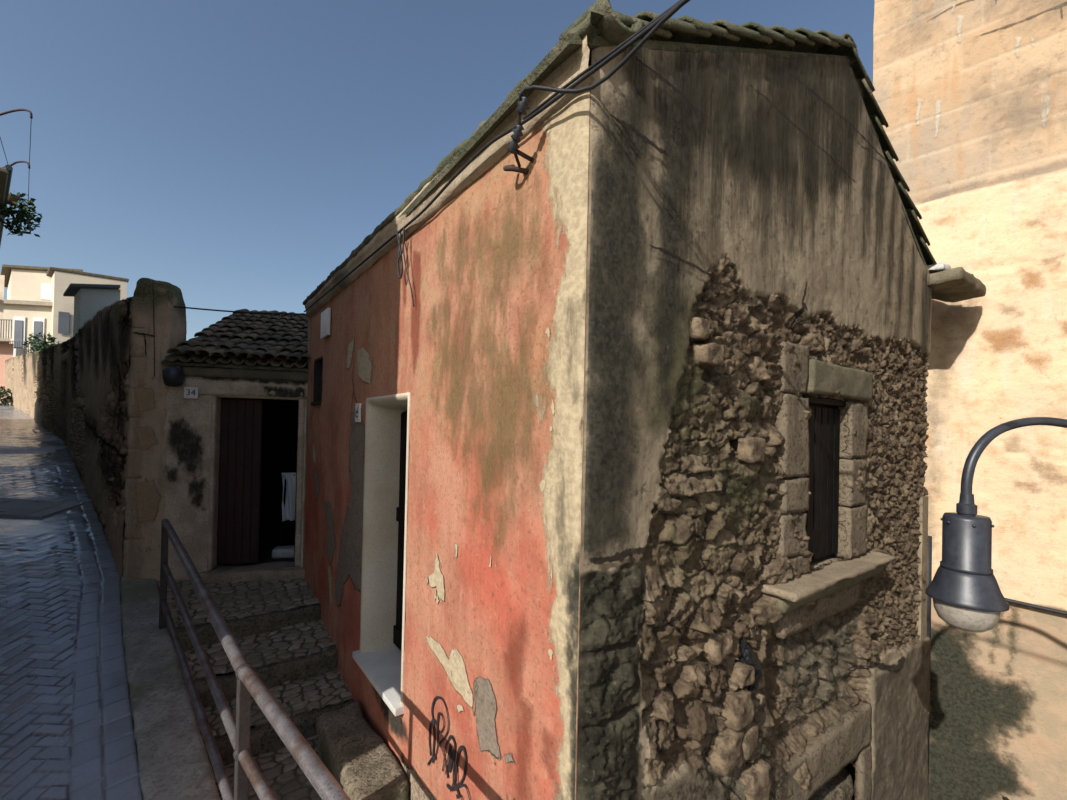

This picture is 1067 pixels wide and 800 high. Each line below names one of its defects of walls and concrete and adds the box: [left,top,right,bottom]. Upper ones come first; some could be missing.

damp [165,419,205,510]
flaking render [313,413,365,606]
peeling [346,338,372,384]
damp [402,253,420,367]
peeling [426,553,445,604]
damp [432,304,532,482]
damp [564,45,934,800]
flaking render [636,256,931,800]
flaking render [426,636,514,765]
damp [929,627,1032,800]